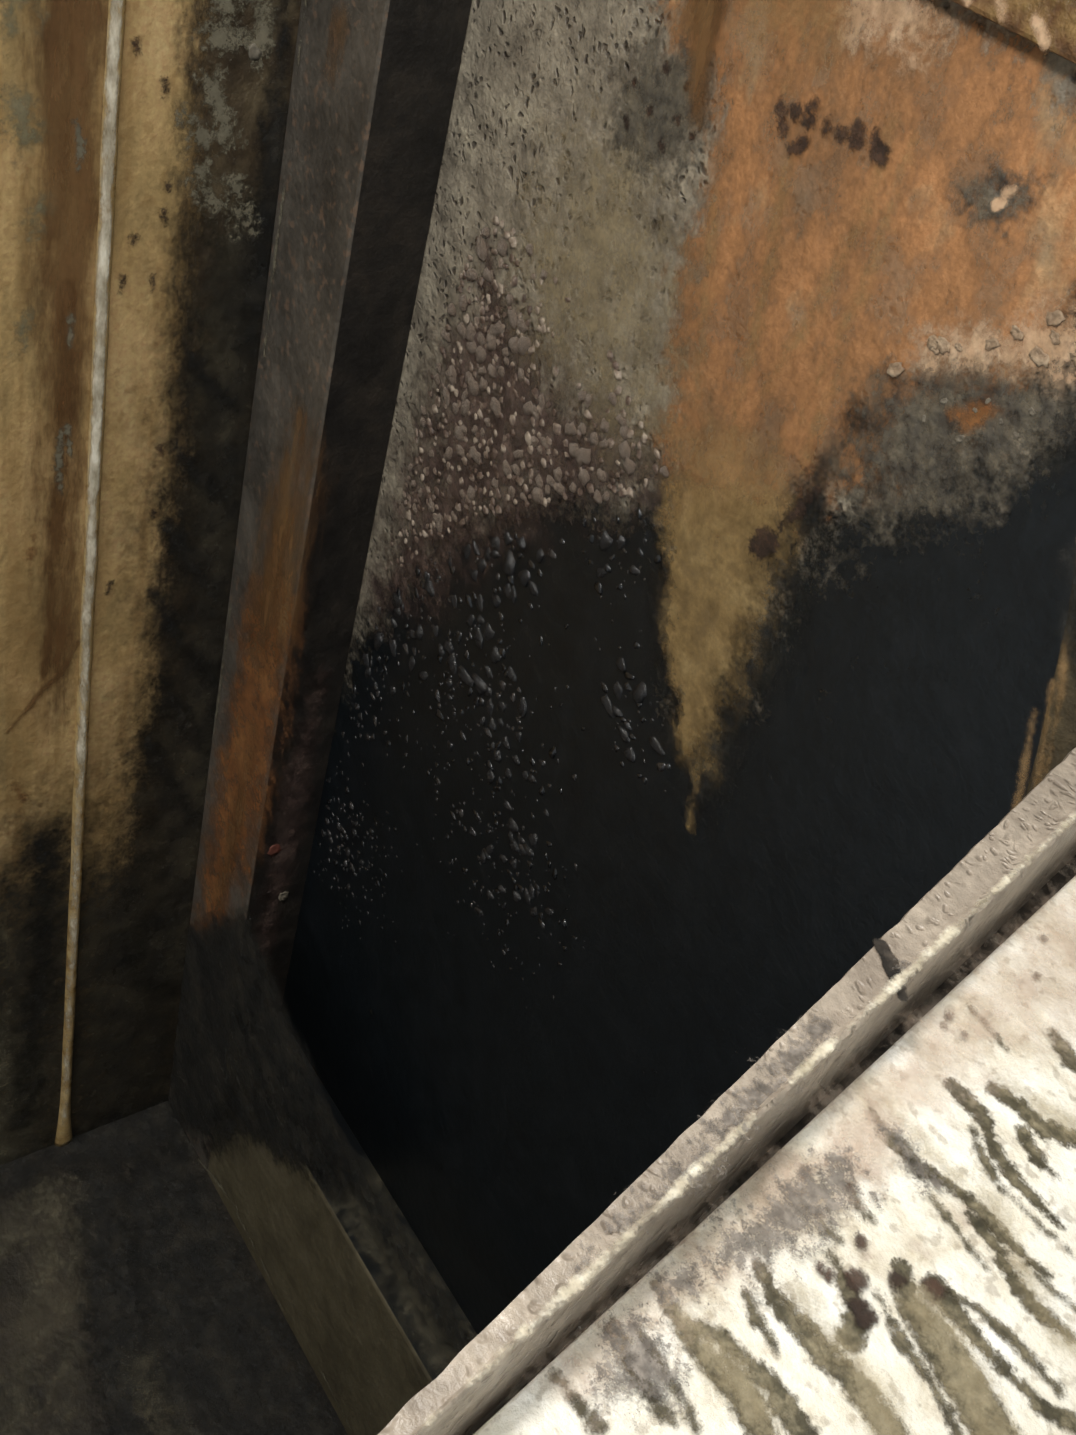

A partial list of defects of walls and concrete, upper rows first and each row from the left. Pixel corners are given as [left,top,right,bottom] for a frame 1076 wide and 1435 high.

damp [483,245,508,348]
corrosion [612,0,1076,542]